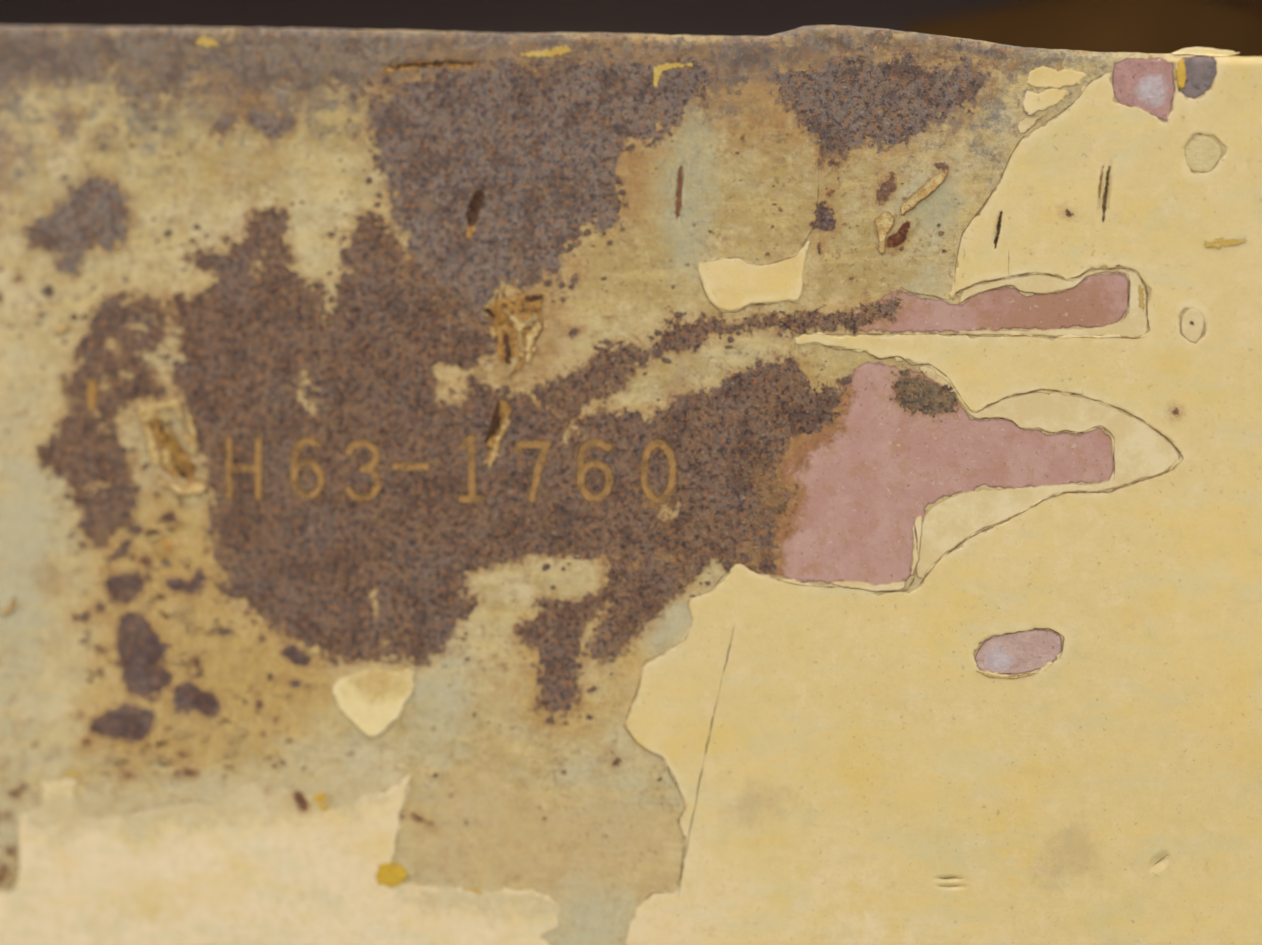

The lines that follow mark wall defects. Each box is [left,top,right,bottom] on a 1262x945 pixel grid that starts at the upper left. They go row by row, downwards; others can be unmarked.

peeling [955,47,1240,271]
peeling [696,190,819,313]
peeling [807,268,1149,339]
corrosion [0,25,1026,746]
peeling [771,354,1183,592]
peeling [332,668,414,737]
peeling [975,628,1064,679]
corrosion [172,751,198,780]
crack [626,638,686,903]